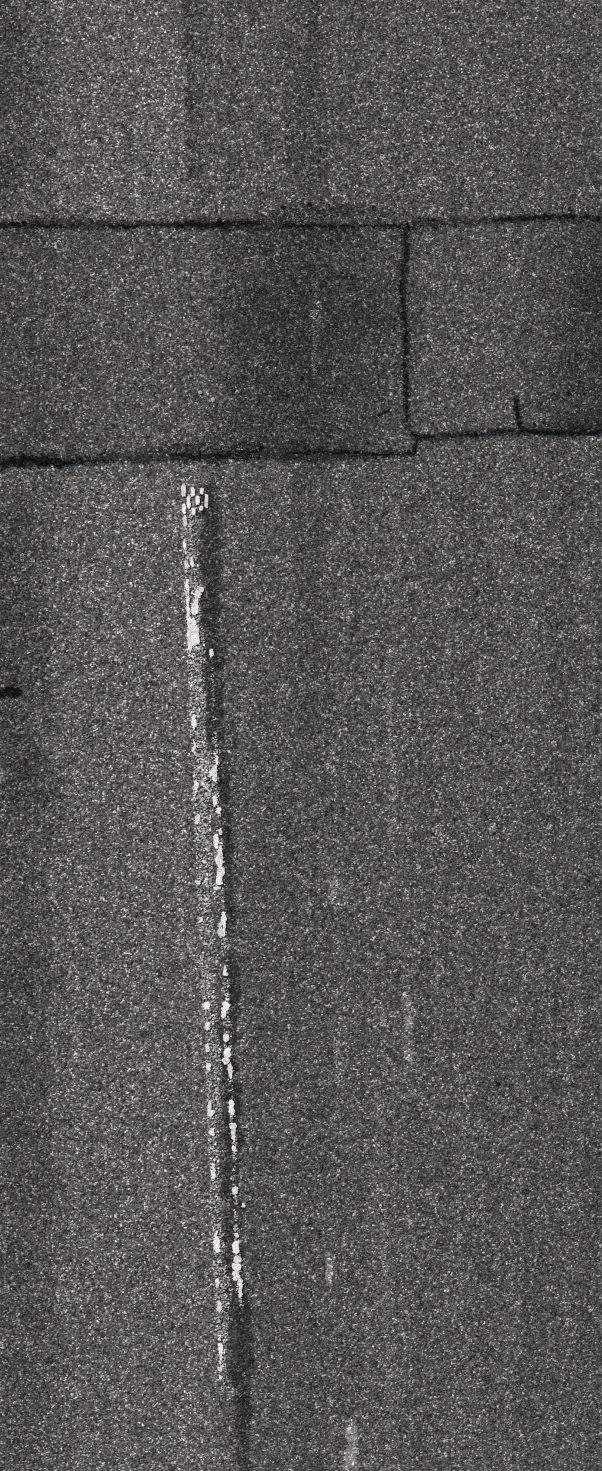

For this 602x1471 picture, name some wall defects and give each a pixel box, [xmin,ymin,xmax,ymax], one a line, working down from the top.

crack [0,200,602,469]
crack [0,686,20,697]
damp [198,482,236,933]
damp [218,954,254,1471]